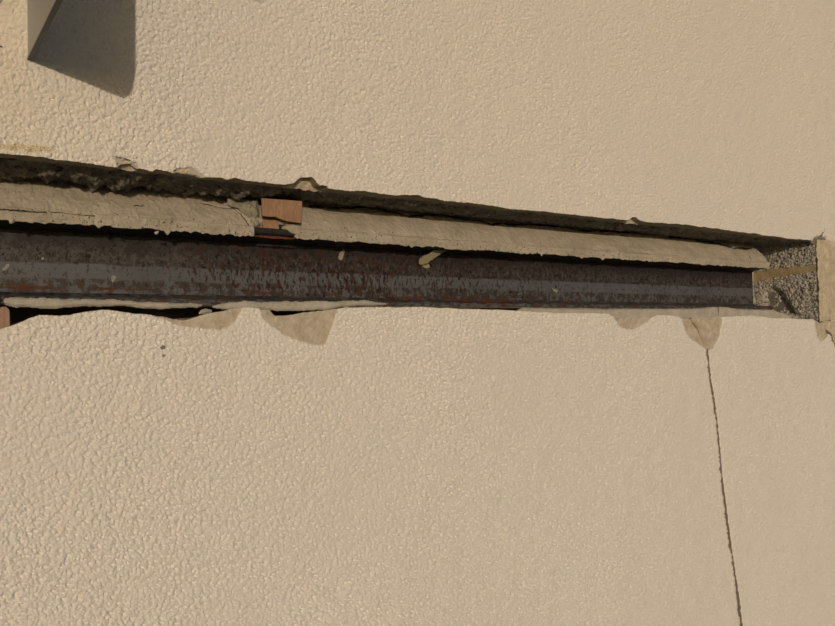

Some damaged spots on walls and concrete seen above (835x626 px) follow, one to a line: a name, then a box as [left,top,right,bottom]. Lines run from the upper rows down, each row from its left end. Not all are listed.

spalling [174,168,203,178]
spalling [810,234,835,343]
spalling [158,308,241,330]
spalling [261,308,340,345]
spalling [615,316,653,329]
spalling [682,317,722,350]
crack [689,317,743,626]